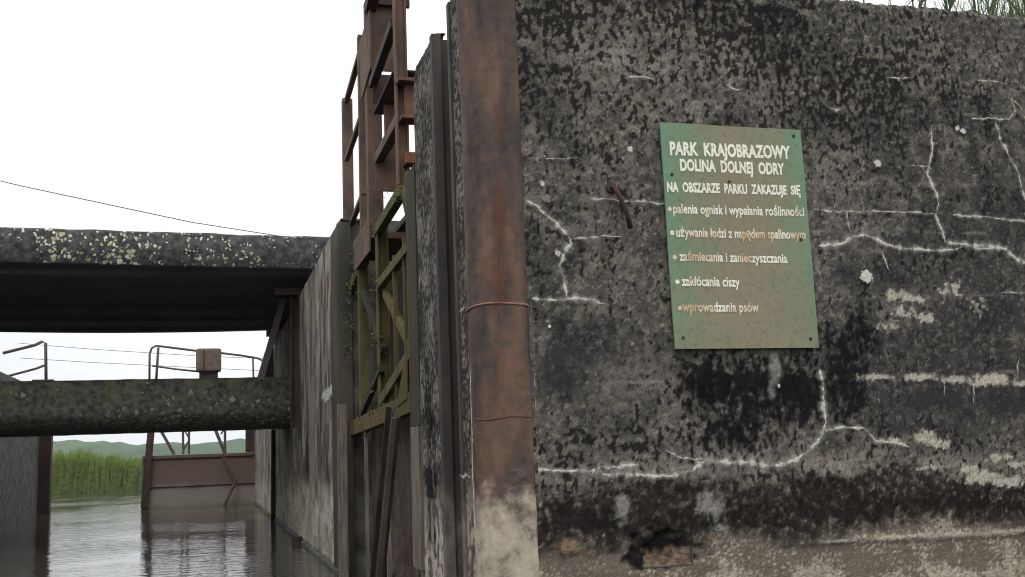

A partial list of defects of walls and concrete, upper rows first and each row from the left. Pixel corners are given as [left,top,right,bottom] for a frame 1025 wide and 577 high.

crack [593,197,665,205]
crack [815,80,1025,268]
crack [526,199,621,430]
crack [538,370,911,503]
water stain [542,475,1023,540]
water stain [985,454,1025,473]